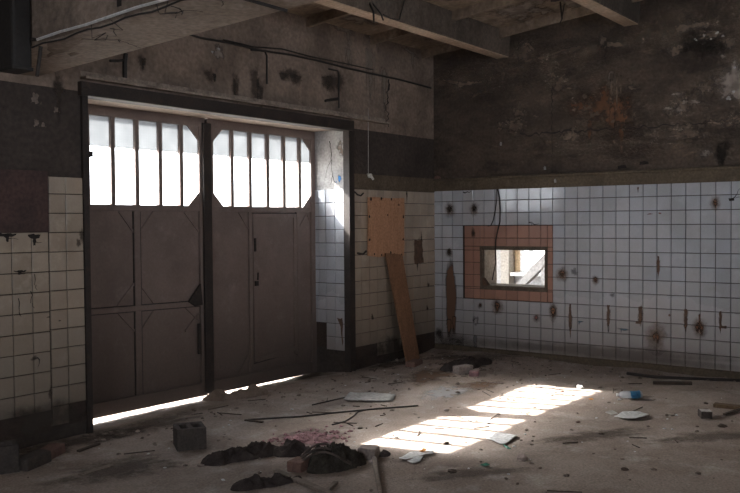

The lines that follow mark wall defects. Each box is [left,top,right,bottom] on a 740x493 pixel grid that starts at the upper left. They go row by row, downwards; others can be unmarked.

leakage [279,69,301,83]
spalling [715,61,740,100]